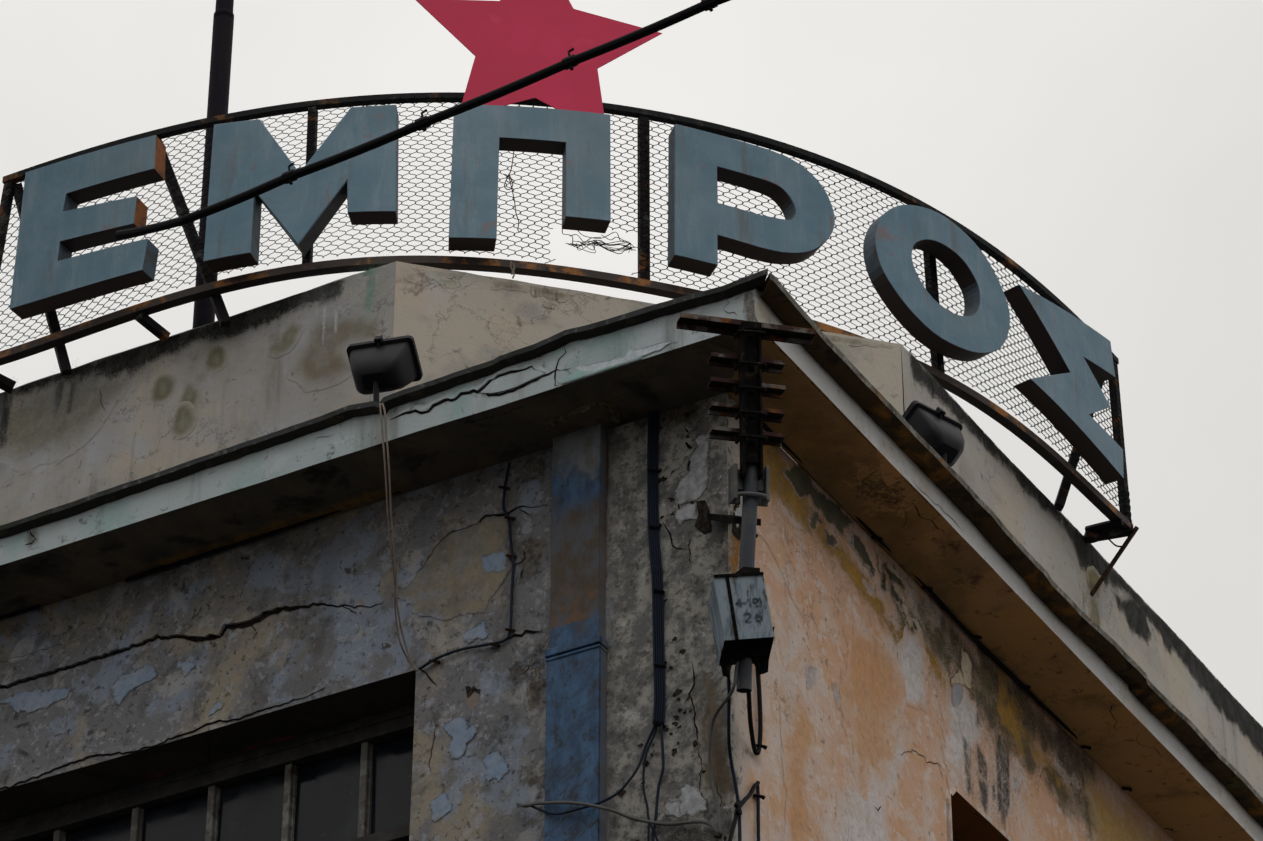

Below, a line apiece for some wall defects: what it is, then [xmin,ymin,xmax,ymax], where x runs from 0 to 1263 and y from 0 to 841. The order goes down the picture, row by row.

damp [0,267,383,489]
crack [390,347,570,419]
damp [0,527,67,581]
peeling [0,686,75,713]
peeling [110,660,196,705]
crack [0,685,325,790]
crack [0,495,544,689]
peeling [763,445,972,841]
damp [762,340,1100,840]
damp [909,352,1263,756]
peeling [987,816,1013,841]